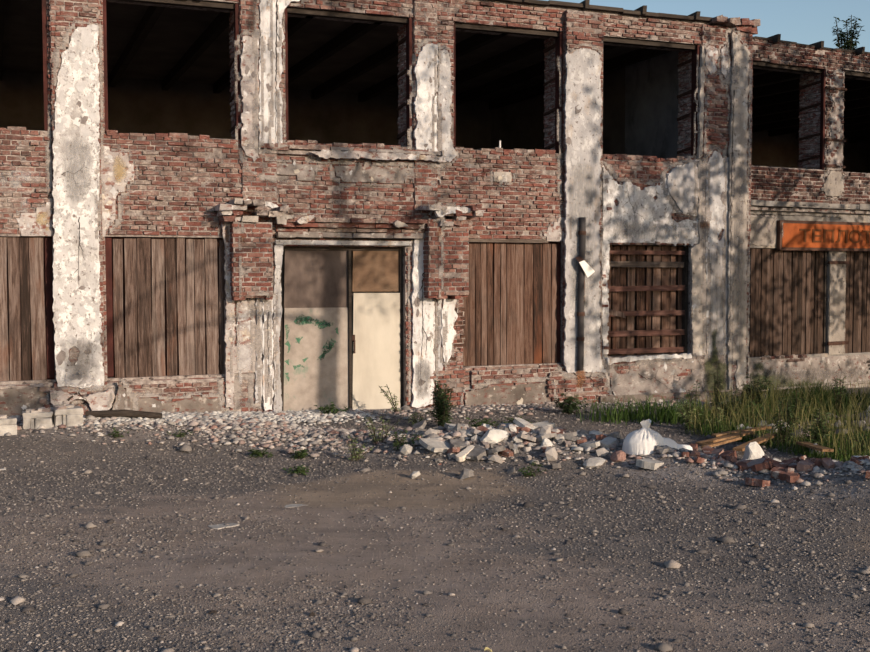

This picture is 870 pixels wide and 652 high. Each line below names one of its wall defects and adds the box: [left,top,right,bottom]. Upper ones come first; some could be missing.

peeling [0,0,811,441]